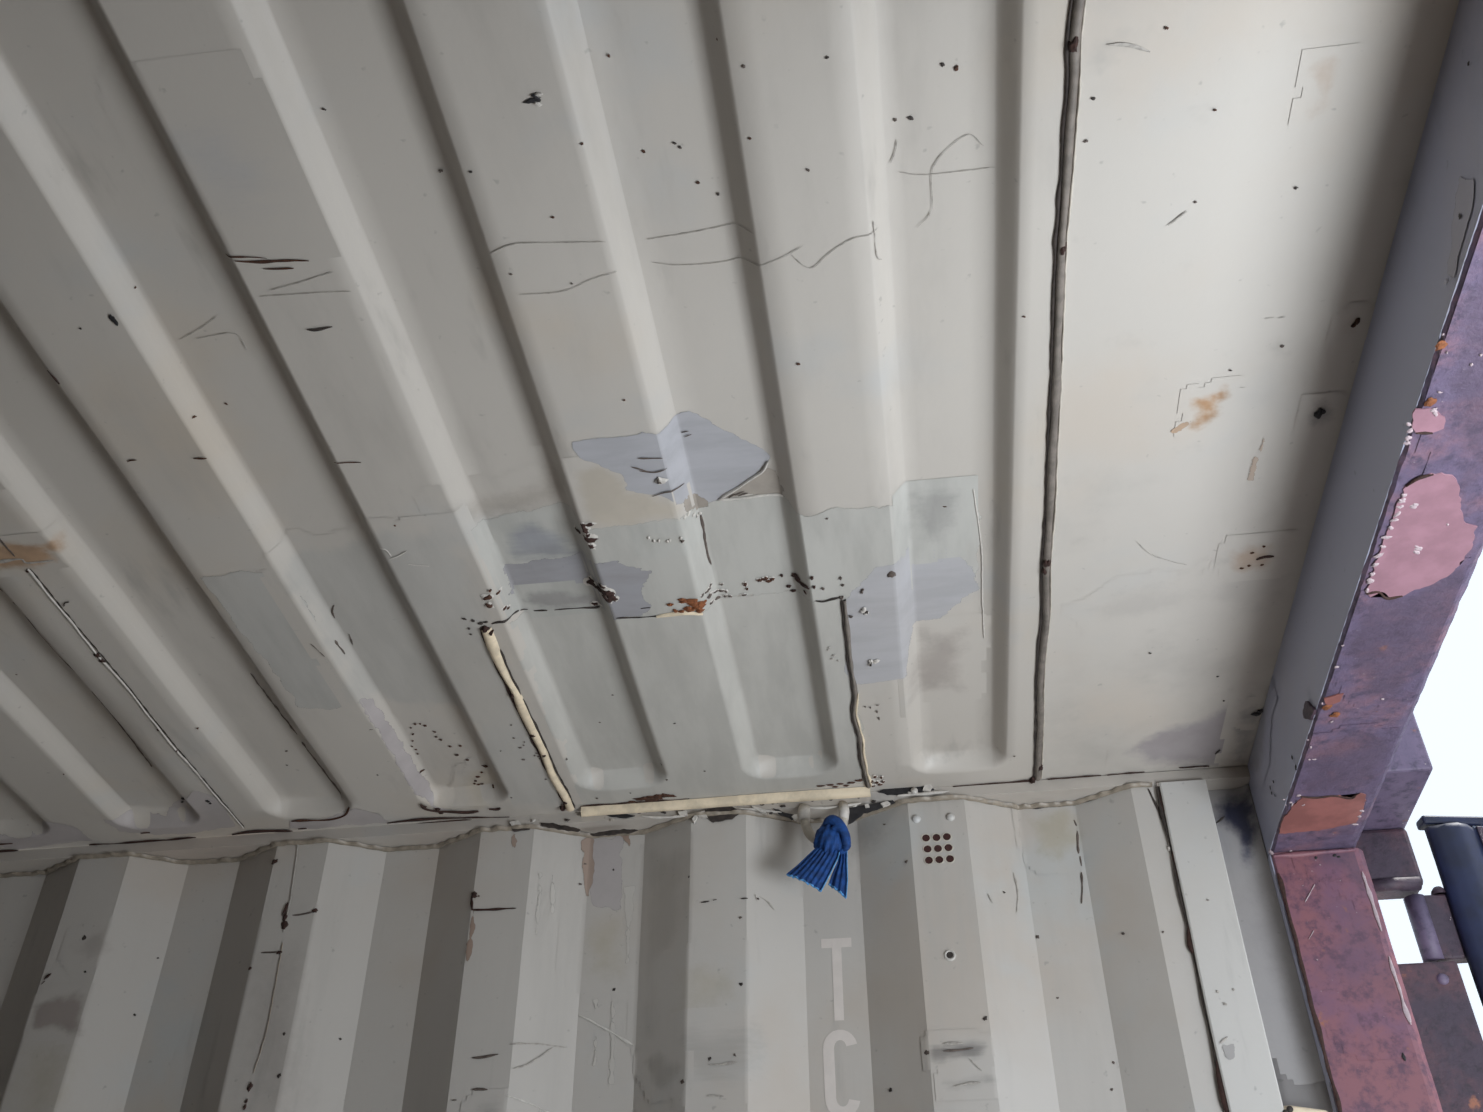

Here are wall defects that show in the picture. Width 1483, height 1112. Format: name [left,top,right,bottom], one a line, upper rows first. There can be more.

rust [1294,391,1348,437]
peeling [1403,391,1446,445]
rust [1415,228,1483,505]
rust [667,573,864,613]
peeling [1365,472,1477,600]
rust [1270,558,1472,802]
peeling [1279,793,1366,834]
rust [1278,873,1342,1112]